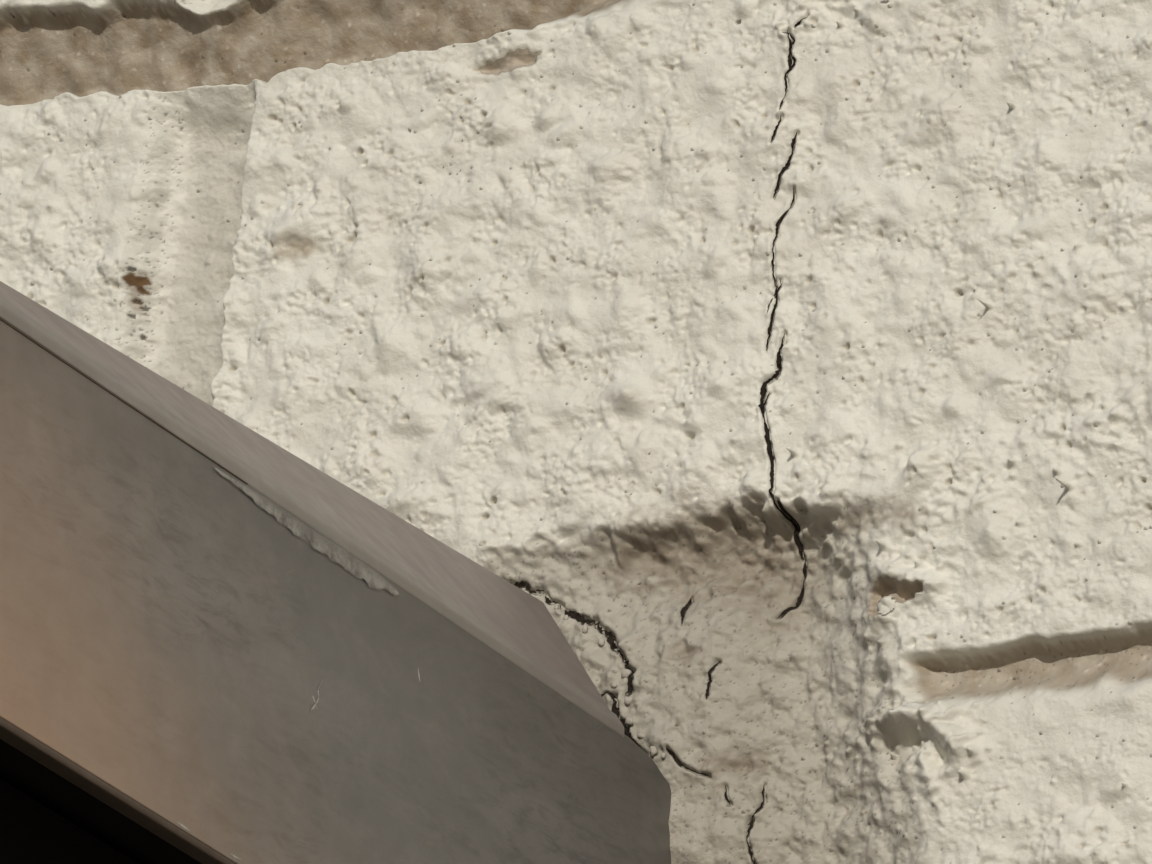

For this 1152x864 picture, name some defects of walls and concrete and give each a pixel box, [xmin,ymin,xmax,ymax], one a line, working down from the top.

crack [758,17,807,618]
crack [510,581,765,864]